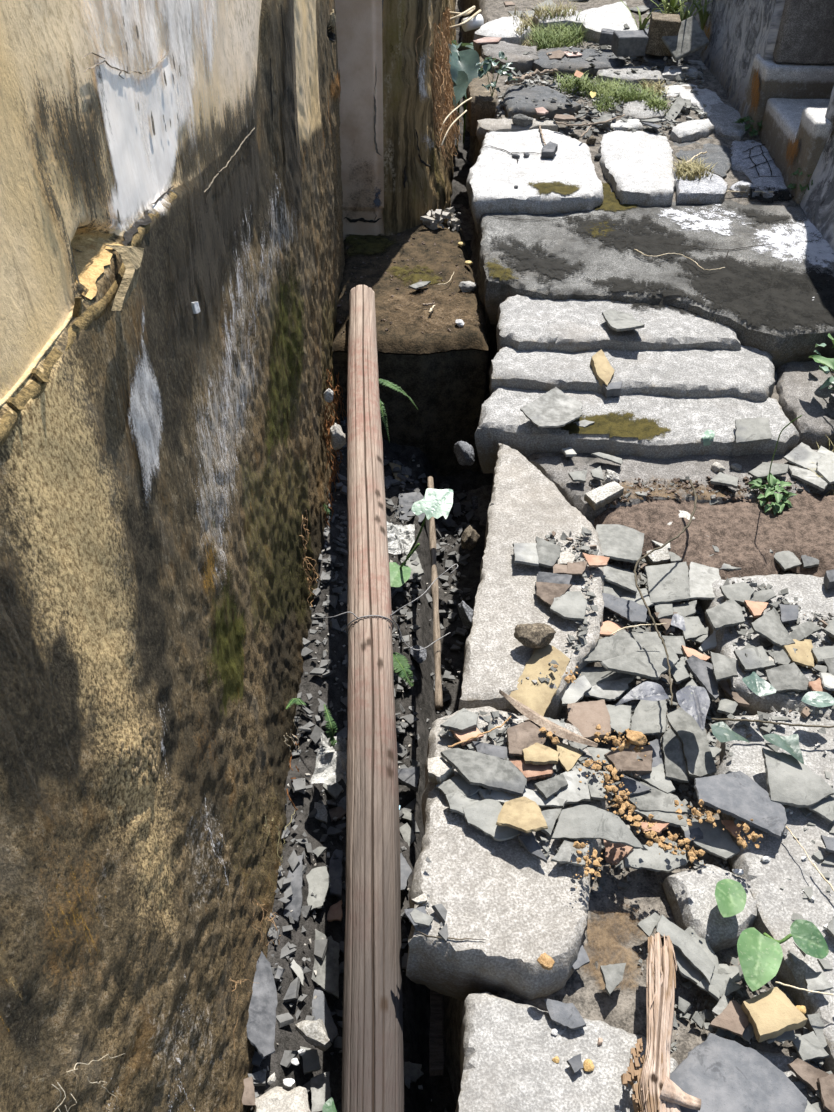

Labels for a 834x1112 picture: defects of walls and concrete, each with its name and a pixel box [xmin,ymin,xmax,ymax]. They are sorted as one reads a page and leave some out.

damp [23,53,113,319]
peeling [0,0,214,446]
damp [128,341,162,491]